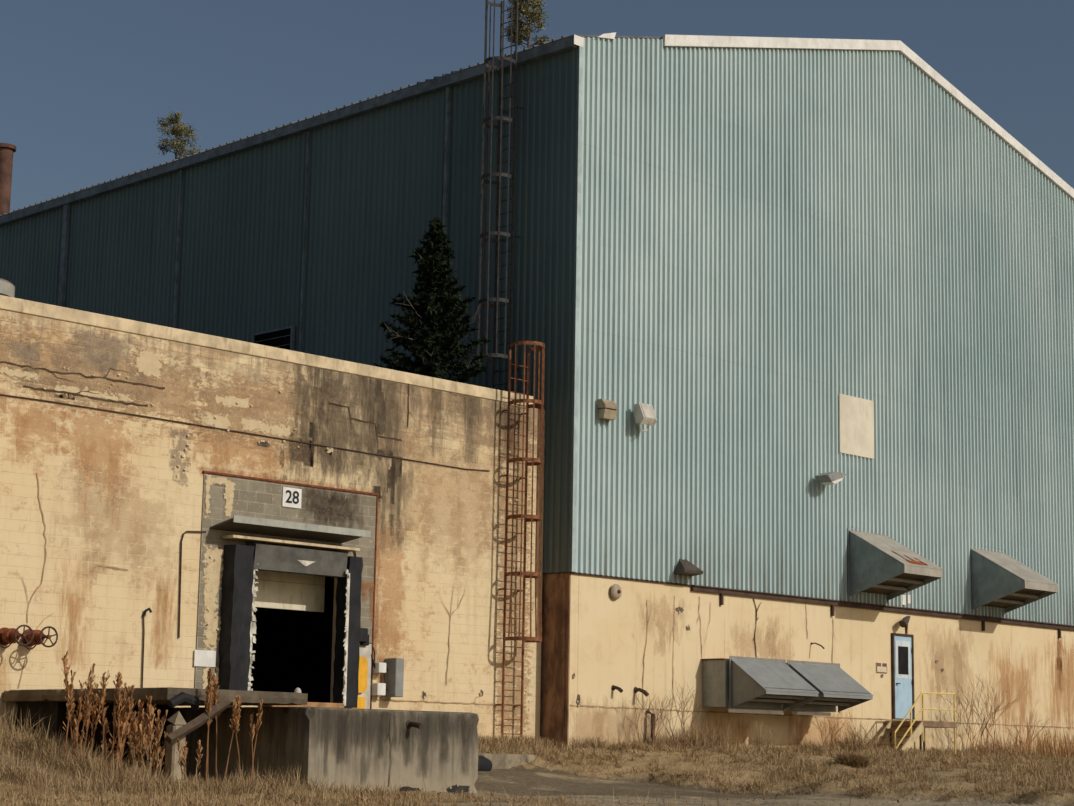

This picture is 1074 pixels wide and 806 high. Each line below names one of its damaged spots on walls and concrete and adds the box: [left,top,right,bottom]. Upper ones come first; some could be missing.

crack [0,361,165,406]
damp [298,371,363,471]
peeling [204,474,236,520]
crack [16,474,52,628]
peeling [201,543,224,651]
peeling [202,665,219,689]
crack [376,582,527,787]